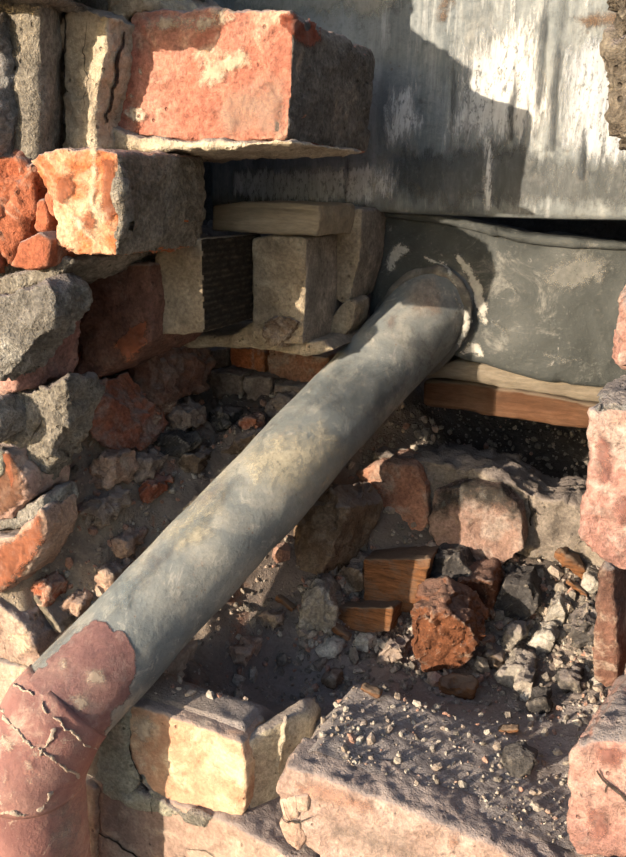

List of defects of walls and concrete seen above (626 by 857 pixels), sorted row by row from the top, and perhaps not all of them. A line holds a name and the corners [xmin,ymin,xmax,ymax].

crack [63,14,125,123]
damp [199,49,249,85]
damp [233,0,626,210]
efflorescence [387,243,410,271]
efflorescence [425,253,504,357]
damp [320,364,406,412]
peeling [87,671,104,683]
crack [99,833,137,857]